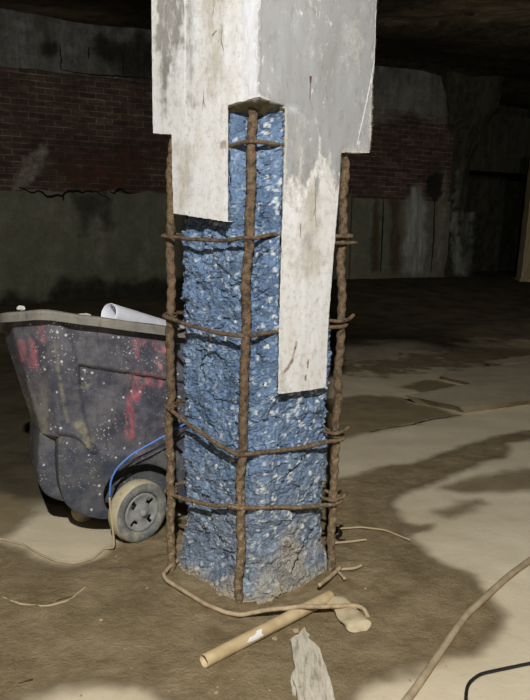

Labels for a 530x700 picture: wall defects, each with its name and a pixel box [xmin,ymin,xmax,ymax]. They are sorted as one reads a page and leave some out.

spalling [177,0,376,604]